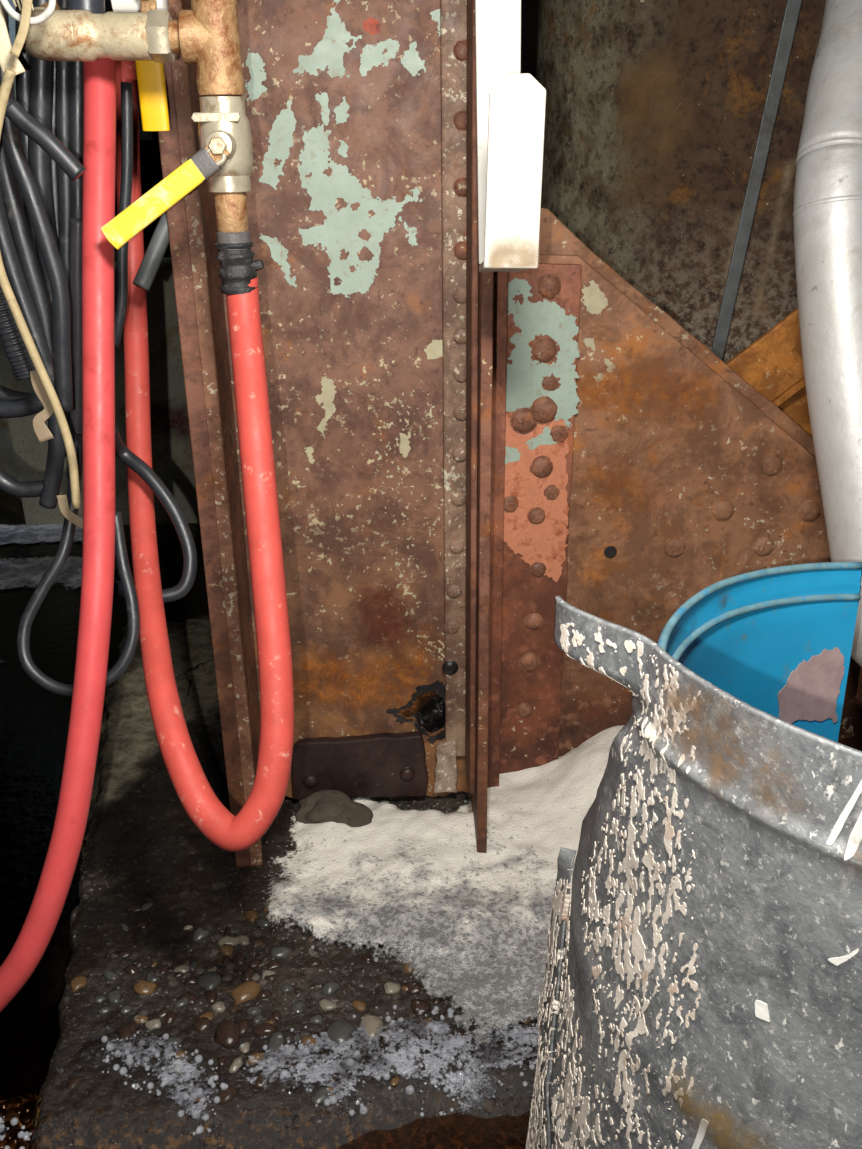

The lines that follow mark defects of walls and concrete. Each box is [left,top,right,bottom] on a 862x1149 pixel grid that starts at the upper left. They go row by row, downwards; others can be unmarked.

peeling [245,49,267,105]
peeling [293,0,426,79]
peeling [259,92,423,298]
corrosion [490,245,537,267]
peeling [503,278,616,582]
peeling [370,390,445,663]
corrosion [293,651,426,711]
corrosion [667,692,743,781]